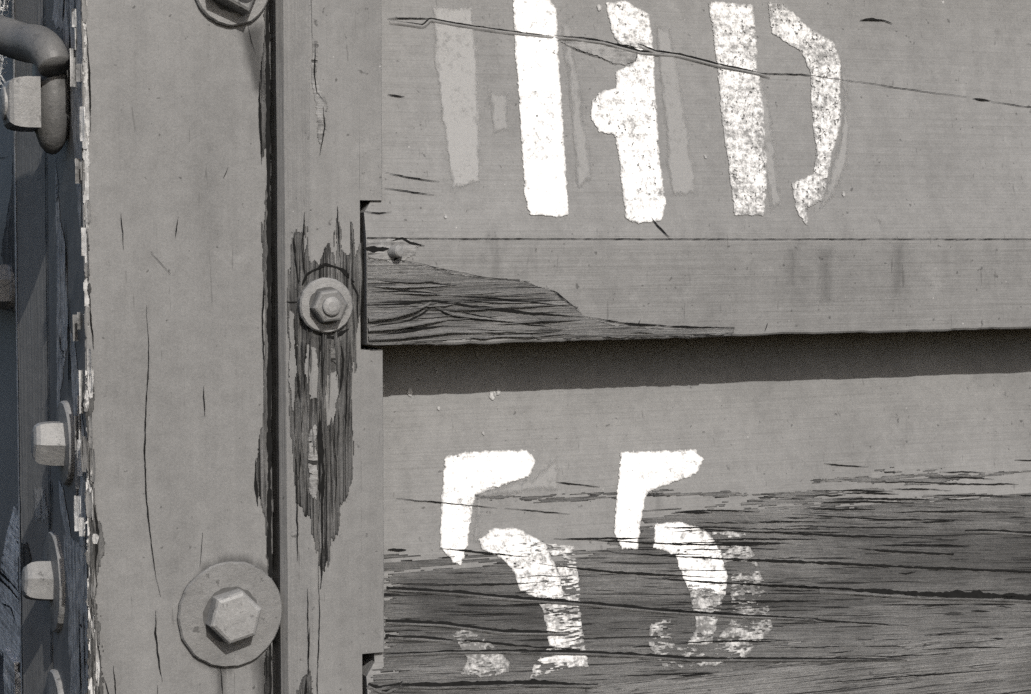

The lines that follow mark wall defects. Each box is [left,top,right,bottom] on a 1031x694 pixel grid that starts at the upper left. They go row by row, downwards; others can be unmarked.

peeling [311,39,328,153]
crack [388,17,1031,107]
peeling [248,0,273,579]
peeling [365,235,424,263]
peeling [35,0,100,694]
peeling [288,311,338,500]
peeling [264,644,272,694]